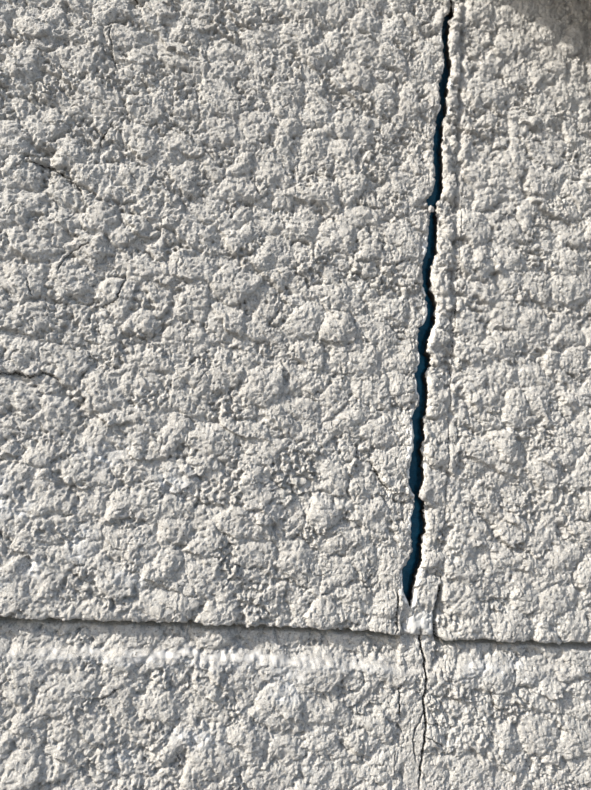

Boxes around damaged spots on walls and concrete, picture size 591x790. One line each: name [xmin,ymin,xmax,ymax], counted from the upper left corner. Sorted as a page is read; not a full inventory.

crack [369,0,465,636]
crack [398,622,444,790]